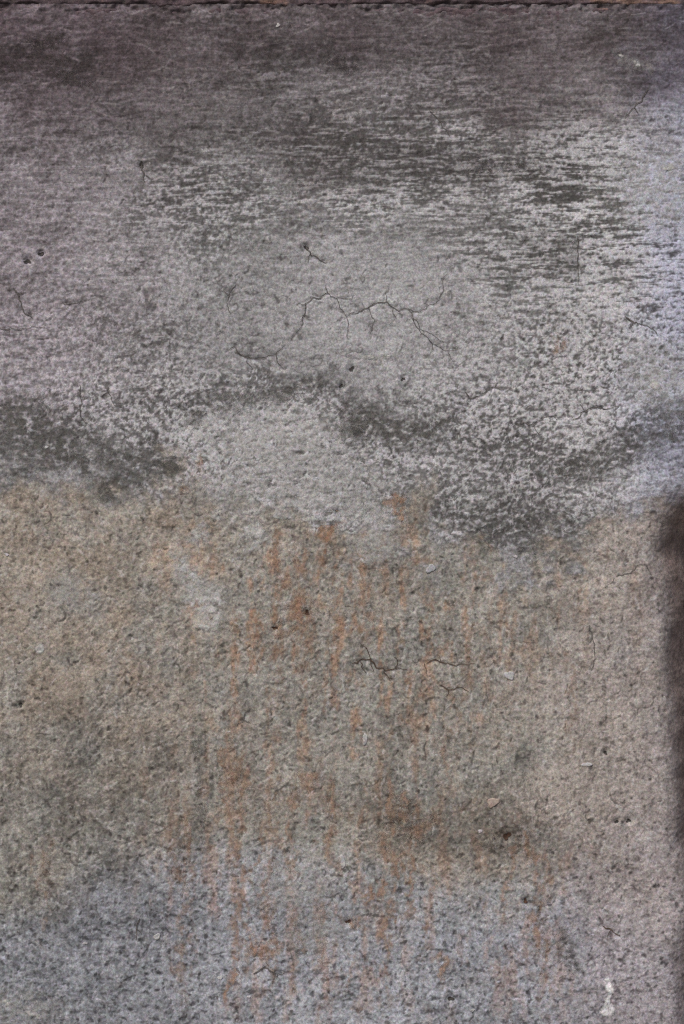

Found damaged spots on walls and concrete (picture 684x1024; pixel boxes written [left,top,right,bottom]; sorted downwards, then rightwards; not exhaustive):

crack [229,245,461,377]
damp [0,399,88,473]
damp [98,430,177,500]
damp [348,406,454,443]